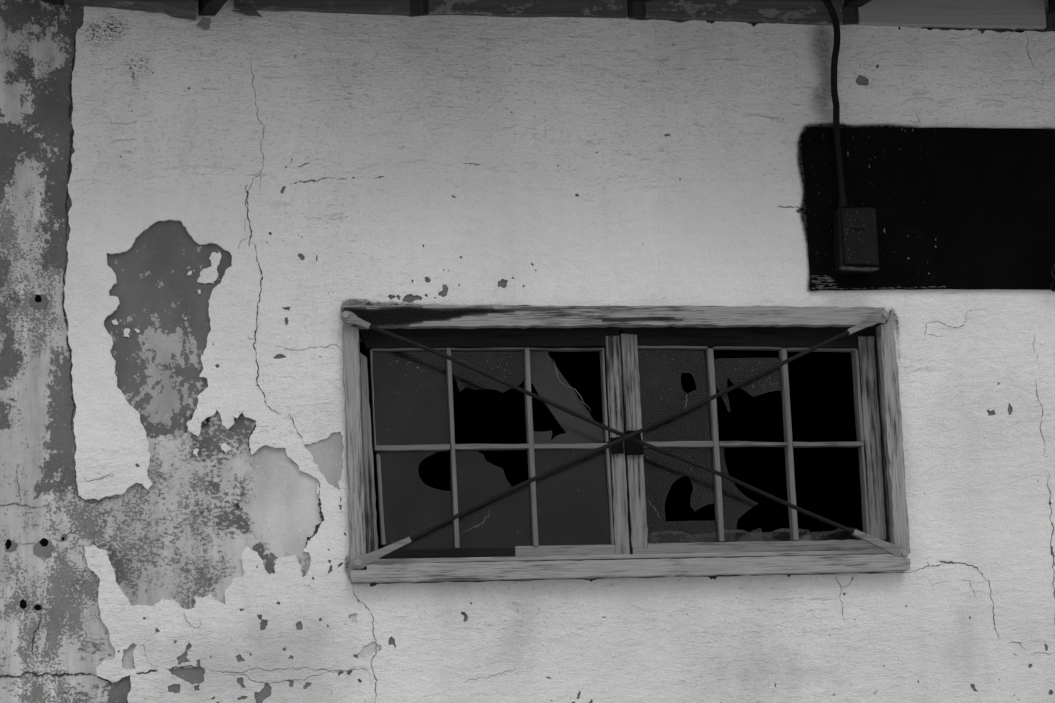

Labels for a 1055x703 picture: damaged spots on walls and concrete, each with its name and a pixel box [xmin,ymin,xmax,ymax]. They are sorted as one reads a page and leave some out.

peeling [0,0,84,429]
crack [238,69,342,441]
spalling [5,539,18,552]
spalling [19,599,43,611]
peeling [21,346,78,499]
peeling [33,220,344,602]
spalling [168,640,212,693]
spalling [237,677,272,703]
crack [916,337,1055,655]